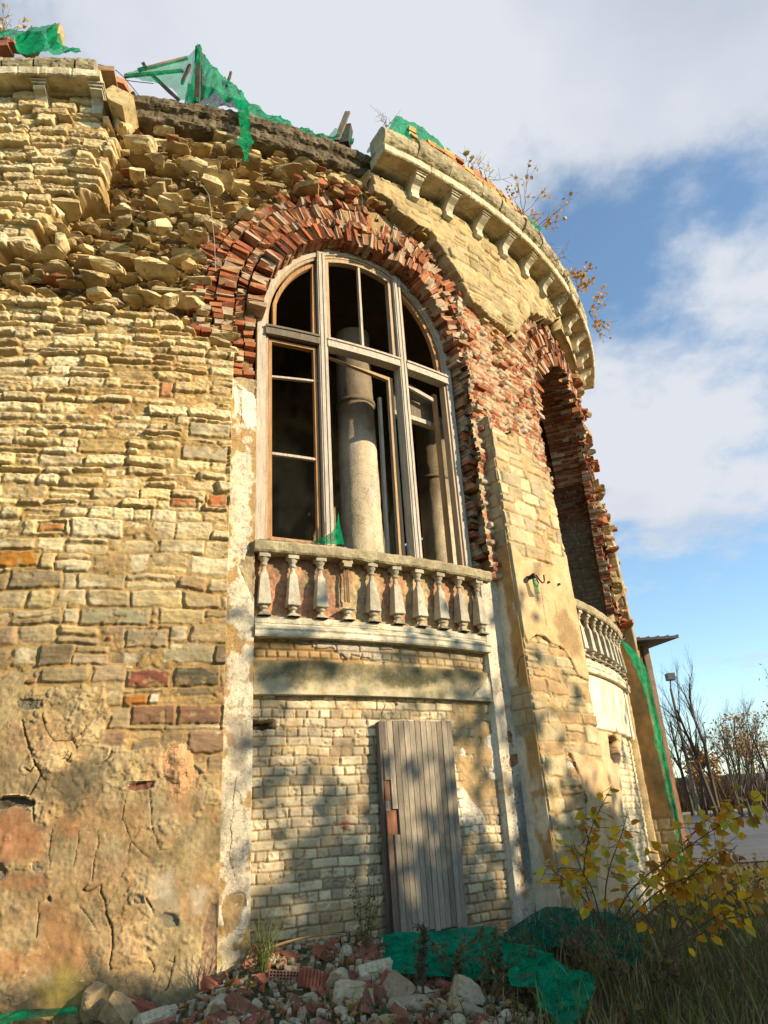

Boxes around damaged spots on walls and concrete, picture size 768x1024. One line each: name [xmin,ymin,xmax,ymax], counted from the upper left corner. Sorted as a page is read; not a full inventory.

spalling [571,362,634,632]
spalling [17,697,43,710]
crack [23,716,114,973]
spalling [607,733,621,765]